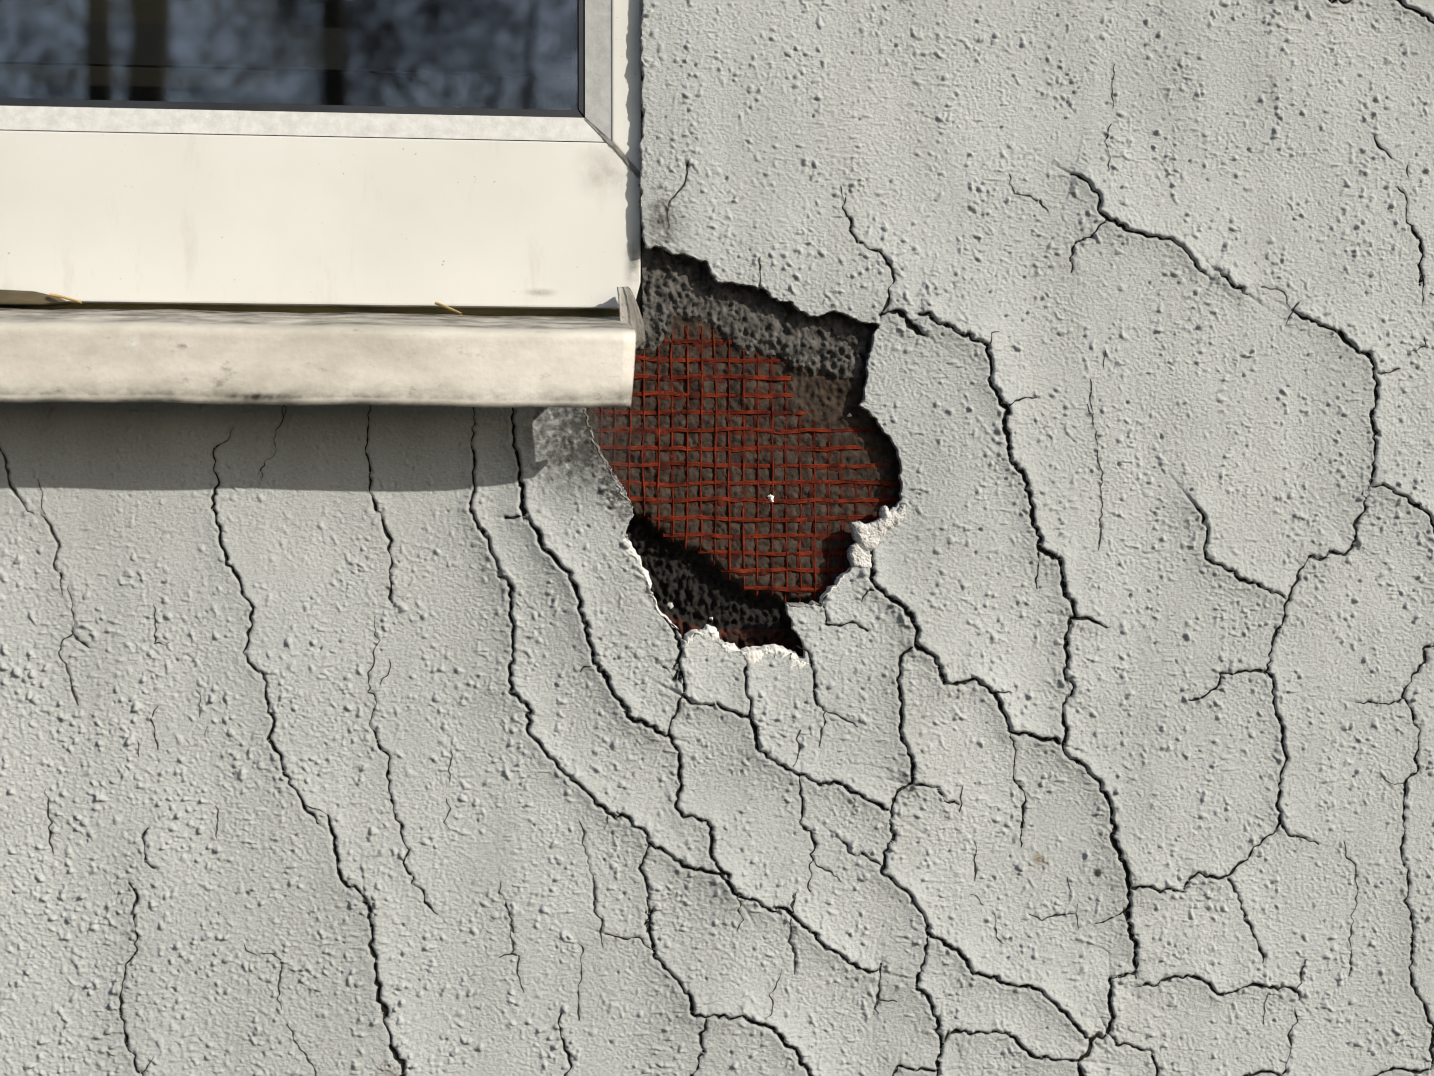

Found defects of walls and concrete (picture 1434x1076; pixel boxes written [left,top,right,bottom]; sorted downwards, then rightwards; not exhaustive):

crack [1396,0,1434,24]
crack [0,448,90,706]
crack [44,788,54,853]
crack [137,706,159,757]
crack [153,605,169,645]
crack [260,405,286,479]
crack [211,427,405,1076]
crack [365,406,438,915]
crack [443,750,453,830]
flaking render [586,238,906,669]
crack [469,64,1434,1076]
crack [119,828,155,1076]